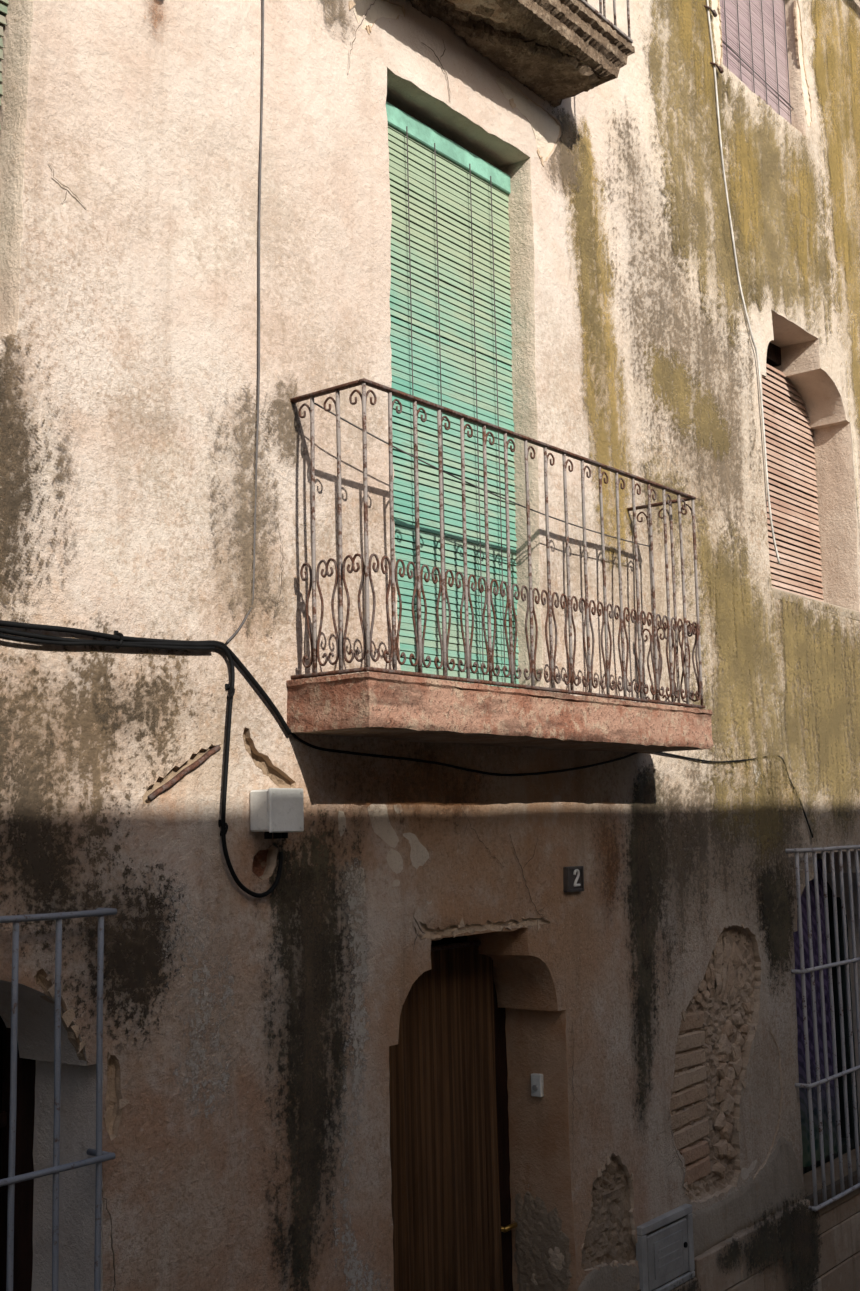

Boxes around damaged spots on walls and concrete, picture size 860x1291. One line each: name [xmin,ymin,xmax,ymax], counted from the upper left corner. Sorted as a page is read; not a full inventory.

leakage [323,0,355,40]
leakage [0,309,238,1115]
peeling [367,803,429,887]
leakage [547,0,860,1141]
leakage [257,810,390,1291]
spalling [581,1153,638,1271]
spalling [670,924,762,1216]
leakage [718,1193,823,1291]